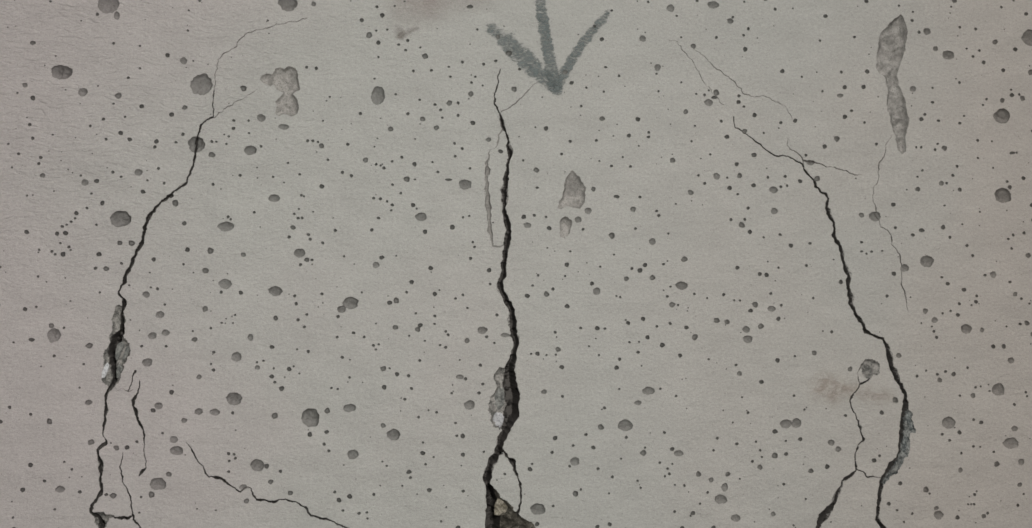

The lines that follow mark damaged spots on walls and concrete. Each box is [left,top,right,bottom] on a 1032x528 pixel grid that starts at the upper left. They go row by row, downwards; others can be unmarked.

spalling [85,305,131,387]
crack [89,18,307,528]
crack [187,443,347,528]
spalling [488,367,507,430]
crack [483,69,536,528]
crack [669,40,909,528]